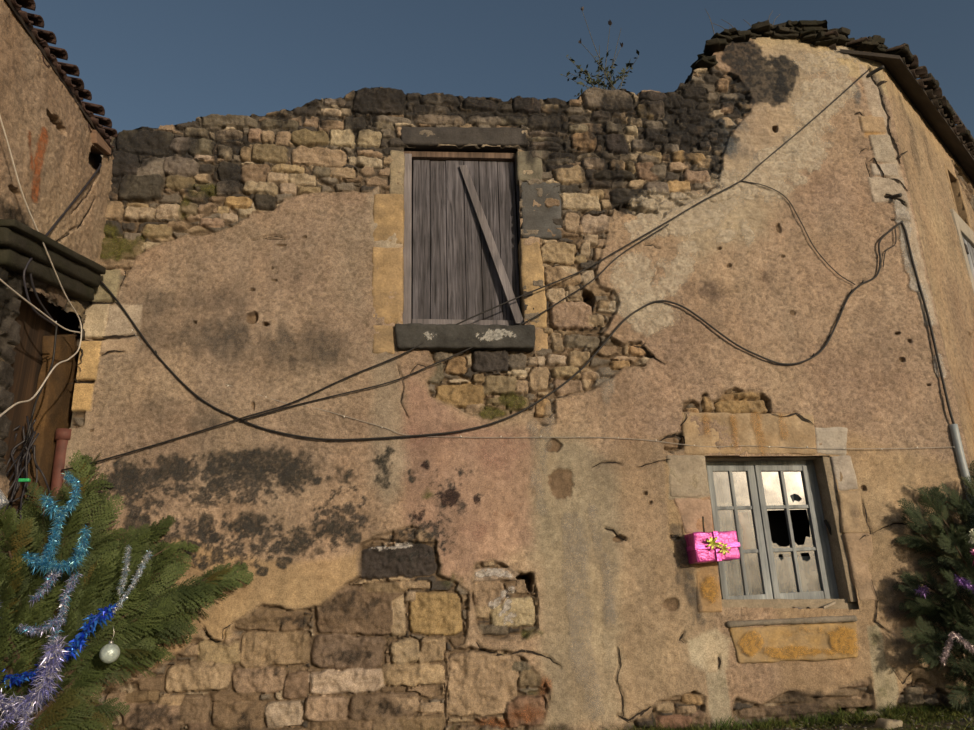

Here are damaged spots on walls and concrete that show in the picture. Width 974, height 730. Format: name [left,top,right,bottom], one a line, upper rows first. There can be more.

water stain [109,126,199,201]
water stain [211,131,250,194]
flaking render [99,65,752,455]
water stain [342,47,861,334]
crack [855,67,908,223]
flaking render [680,386,773,421]
flaking render [87,524,551,730]